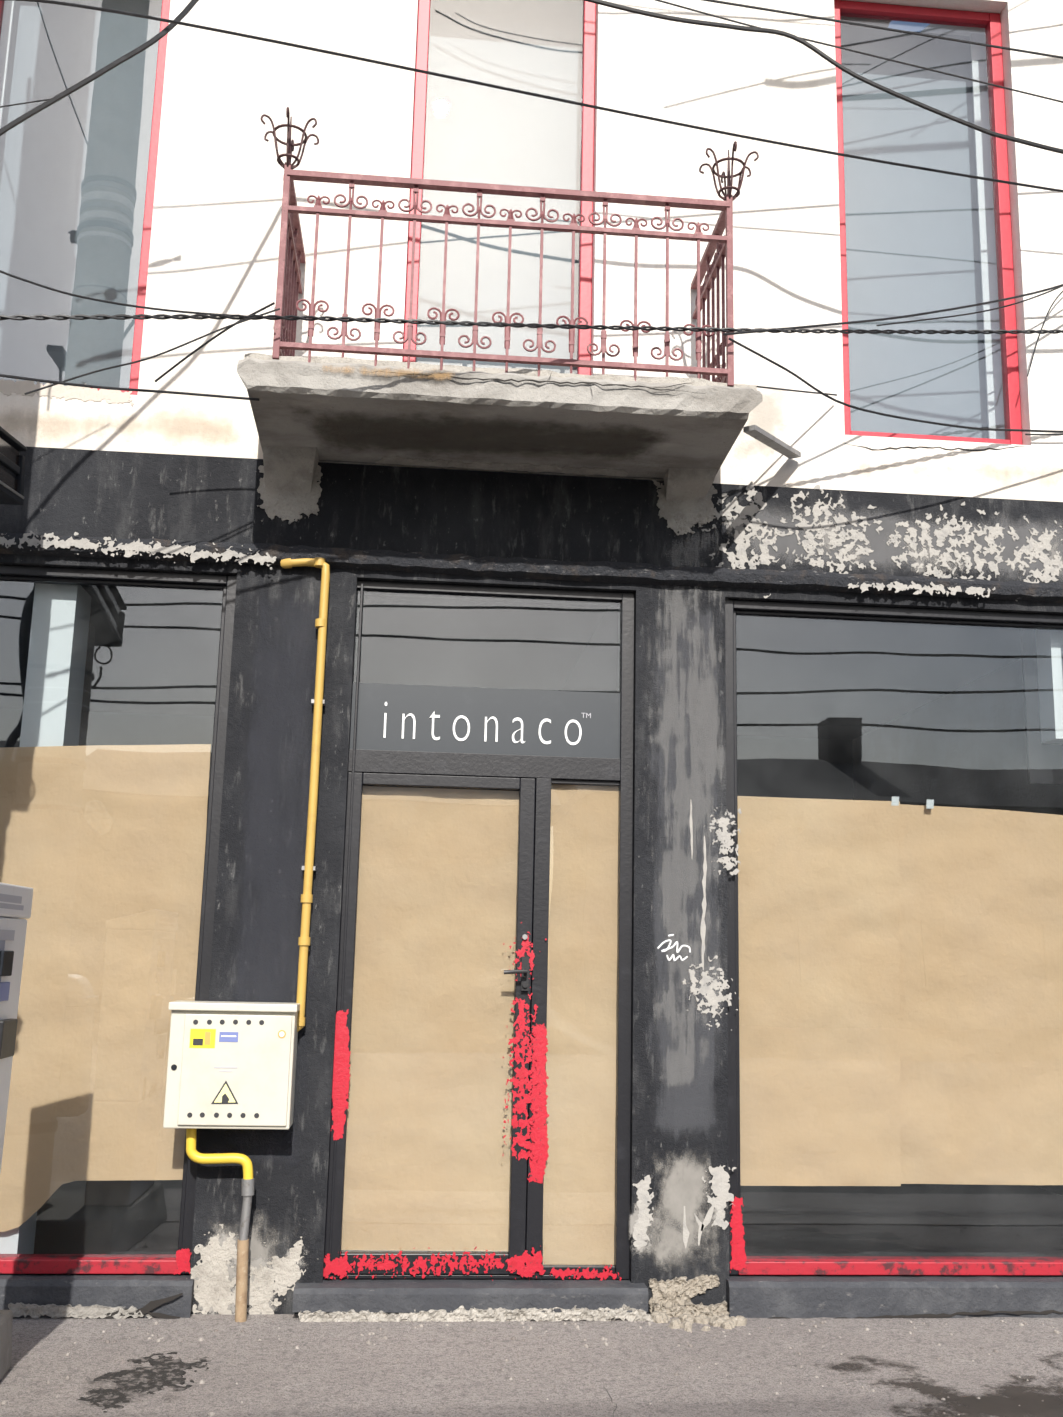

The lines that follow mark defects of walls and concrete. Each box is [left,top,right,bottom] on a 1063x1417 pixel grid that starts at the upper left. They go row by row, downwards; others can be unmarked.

peeling [0,531,277,570]
peeling [652,478,1063,599]
peeling [682,955,740,1031]
flaking render [174,1224,307,1315]
spalling [298,1165,747,1322]
leakage [832,1355,1063,1417]